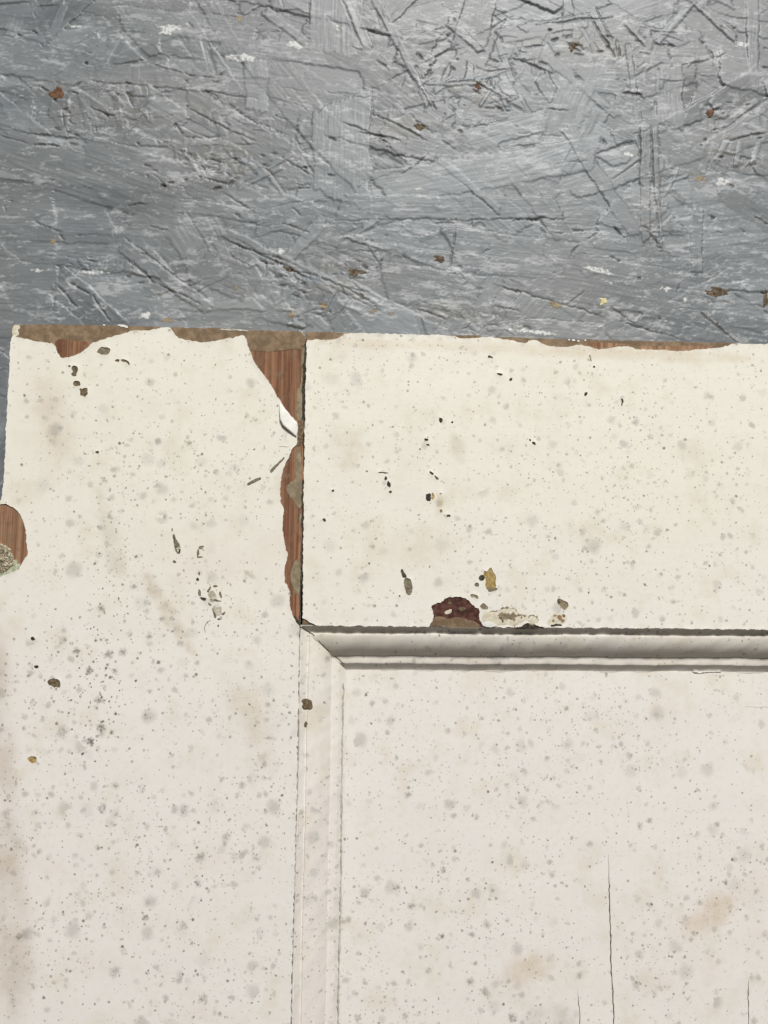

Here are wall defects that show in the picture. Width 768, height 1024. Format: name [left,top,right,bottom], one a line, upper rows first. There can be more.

peeling [0,504,28,577]
peeling [11,324,342,625]
peeling [430,568,544,630]
crack [607,863,615,1024]